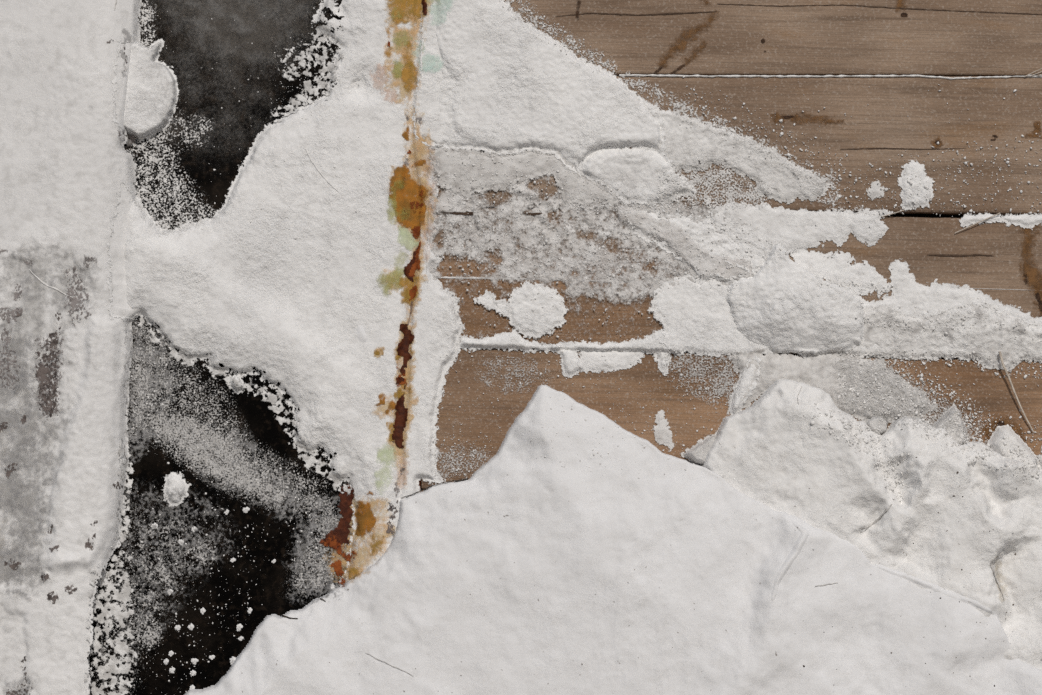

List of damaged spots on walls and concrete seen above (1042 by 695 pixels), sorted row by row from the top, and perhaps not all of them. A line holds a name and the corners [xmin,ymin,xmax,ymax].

peeling [111,38,179,140]
rust [374,0,430,103]
peeling [226,373,246,394]
rust [320,108,433,587]